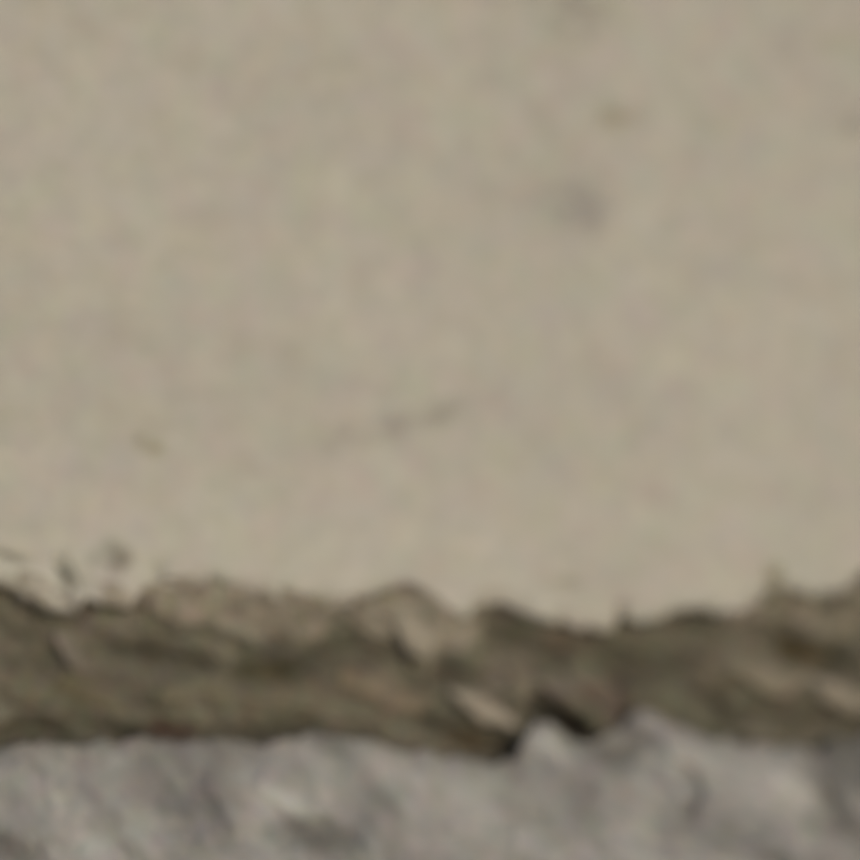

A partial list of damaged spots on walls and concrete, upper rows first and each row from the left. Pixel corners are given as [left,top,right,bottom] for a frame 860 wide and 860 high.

spalling [96,575,484,678]
spalling [695,583,860,653]